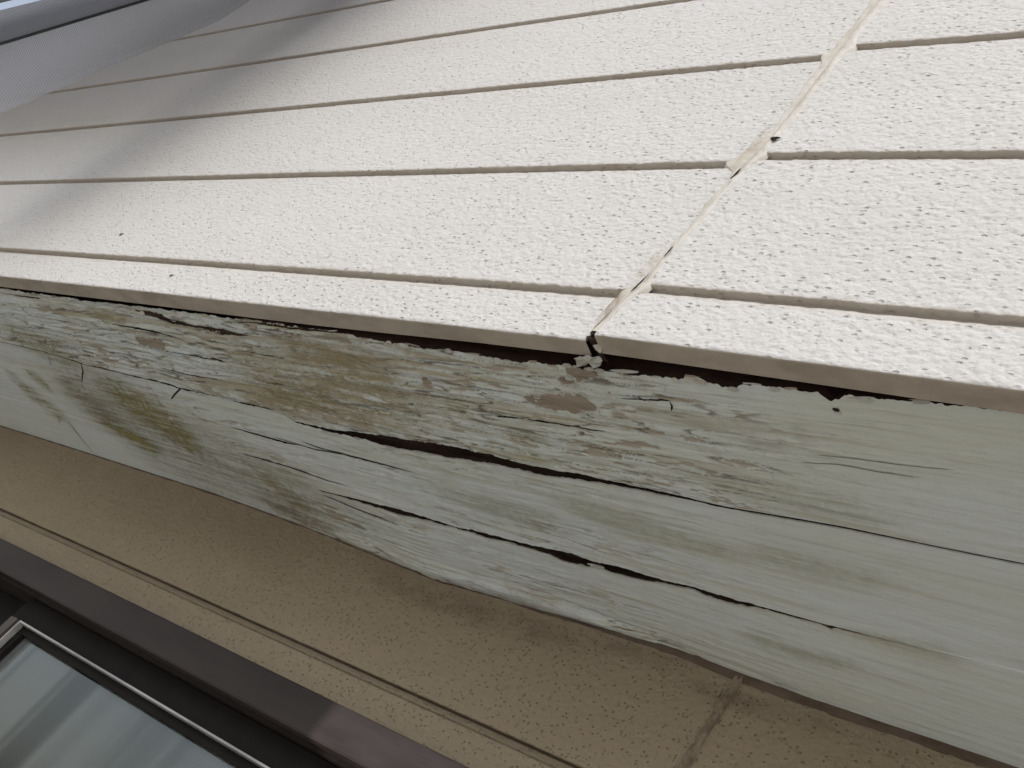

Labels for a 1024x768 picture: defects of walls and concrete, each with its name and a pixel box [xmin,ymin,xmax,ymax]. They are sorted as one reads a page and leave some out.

peeling [134,336,166,352]
peeling [519,363,605,416]
peeling [672,377,706,385]
crack [16,308,1024,661]